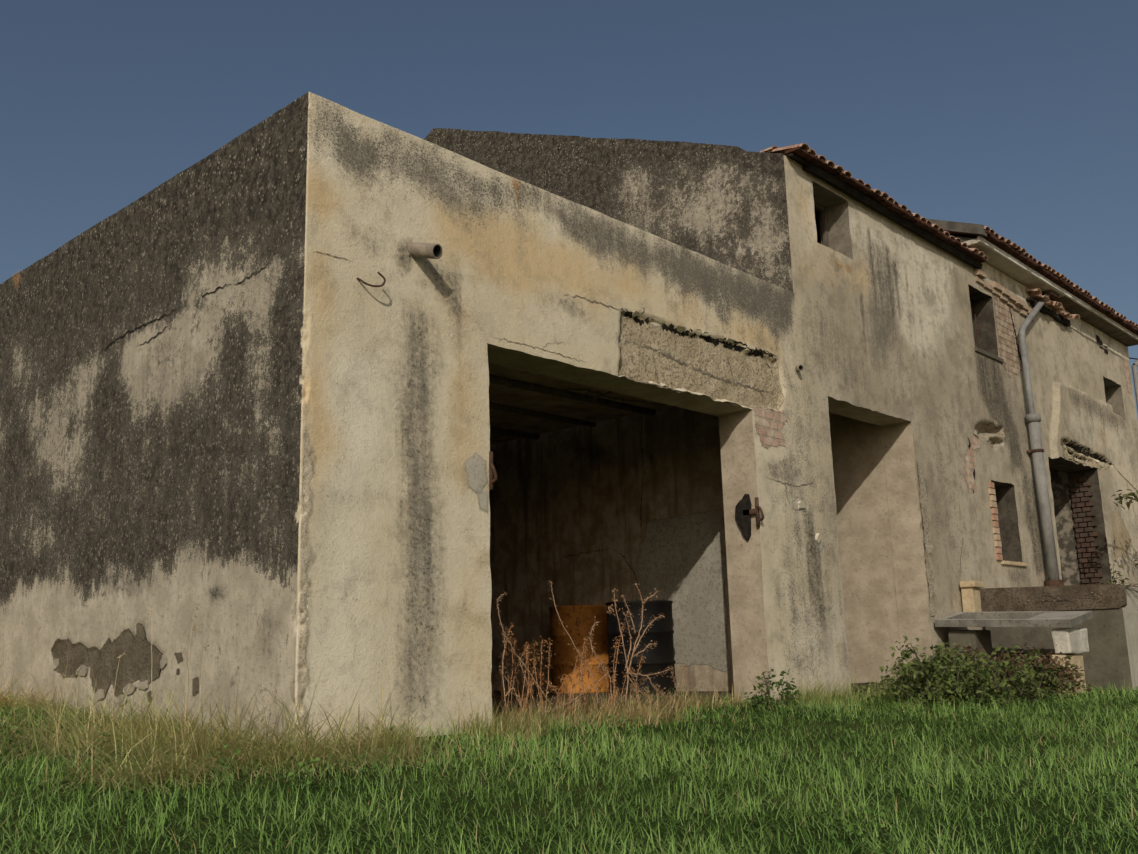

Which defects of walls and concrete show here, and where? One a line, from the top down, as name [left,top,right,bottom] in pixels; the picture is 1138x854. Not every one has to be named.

crack [95,266,266,356]
flaking render [994,295,1023,378]
spalling [1025,288,1080,327]
spalling [618,311,787,449]
water stain [394,306,444,715]
peeling [465,453,488,512]
flaking render [963,419,1005,493]
spalling [1061,441,1110,470]
peeling [51,623,183,706]